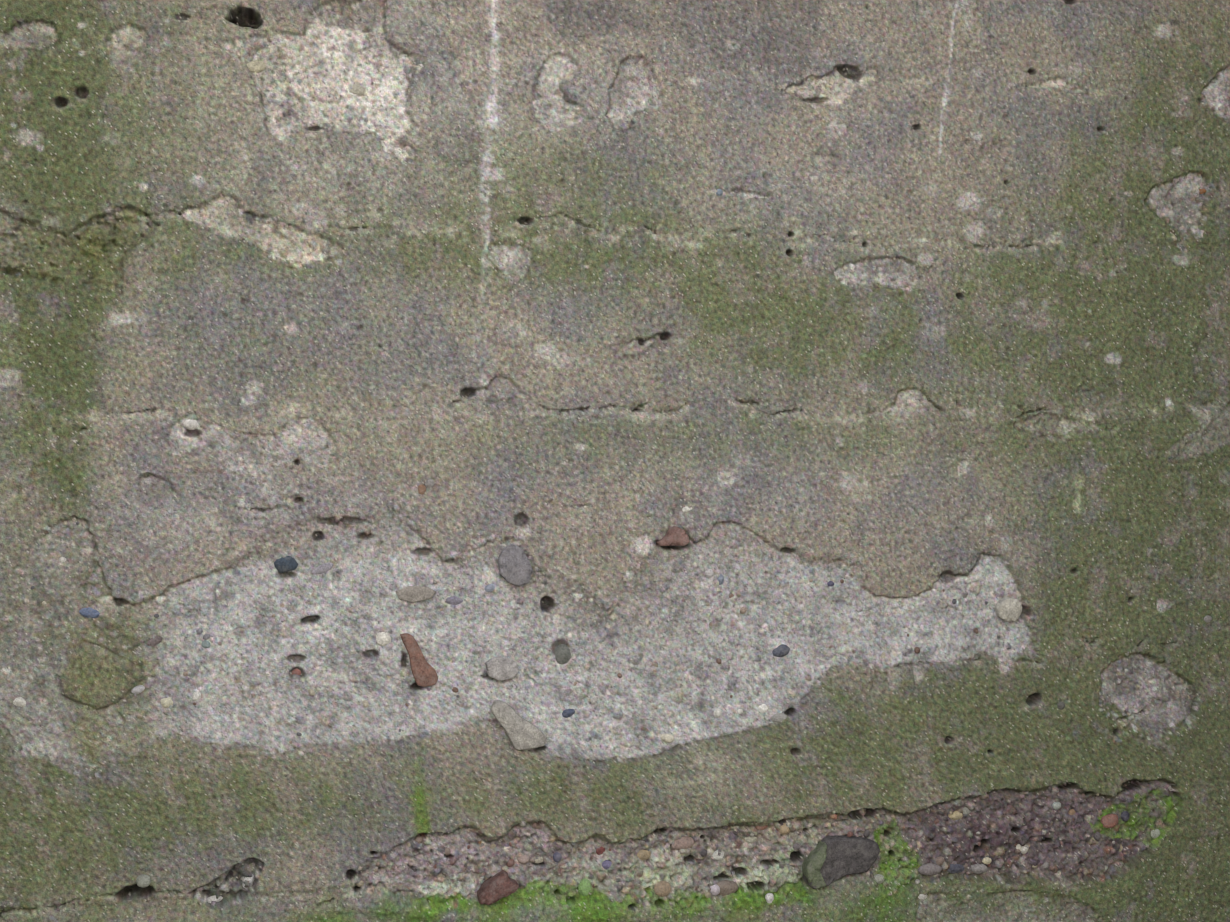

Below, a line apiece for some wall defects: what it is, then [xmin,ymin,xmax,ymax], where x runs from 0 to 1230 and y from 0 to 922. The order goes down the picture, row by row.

spalling [220,0,424,169]
spalling [530,52,667,137]
spalling [778,64,883,113]
spalling [1197,66,1230,123]
spalling [0,204,148,287]
spalling [178,189,357,272]
spalling [835,256,927,298]
spalling [1141,170,1217,253]
crack [559,400,677,415]
spalling [0,411,1042,780]
spalling [1098,651,1203,748]
spalling [348,778,1185,922]